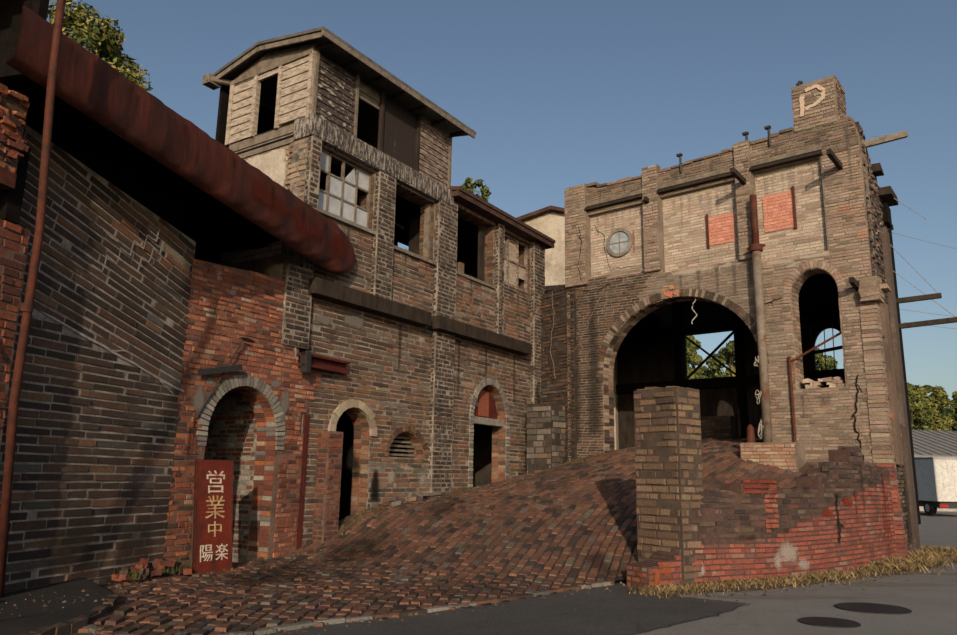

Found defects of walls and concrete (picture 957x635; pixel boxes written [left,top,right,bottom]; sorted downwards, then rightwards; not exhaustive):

crack [850,373,864,462]